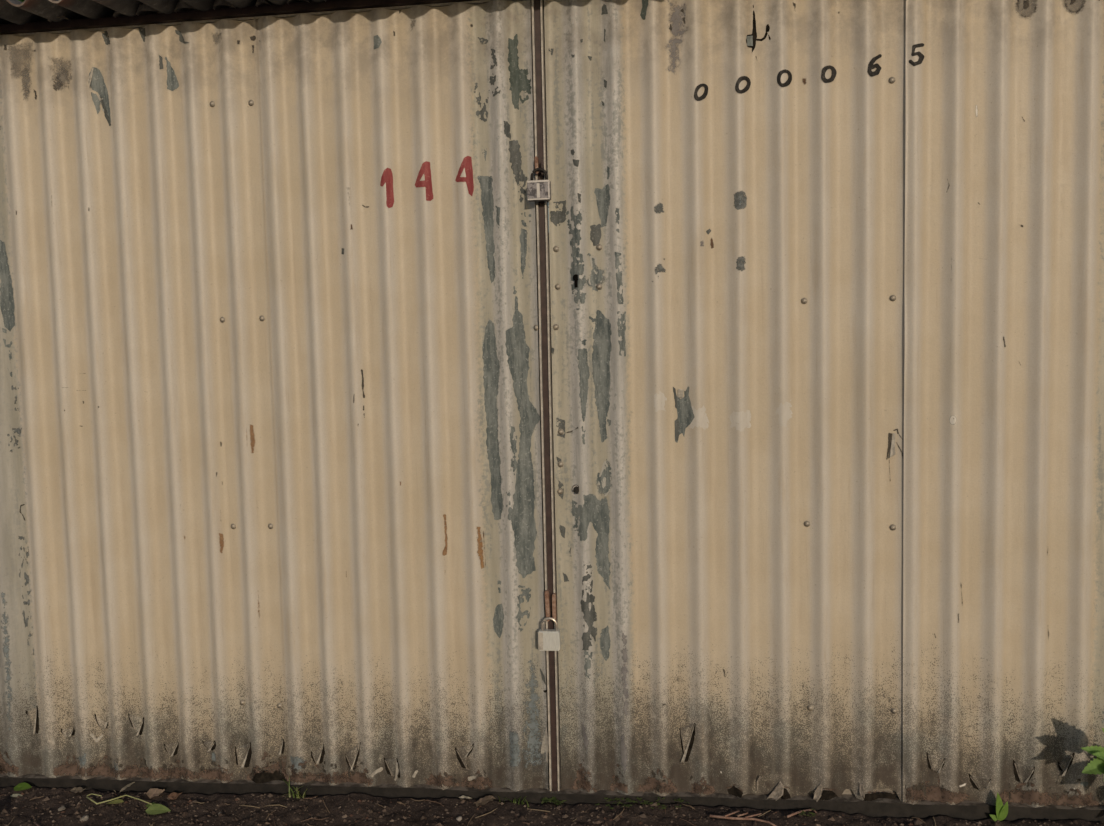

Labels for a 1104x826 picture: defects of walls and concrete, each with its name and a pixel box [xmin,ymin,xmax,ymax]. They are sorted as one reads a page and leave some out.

peeling [88,67,111,126]
peeling [470,24,532,122]
peeling [478,176,500,283]
peeling [0,240,19,411]
peeling [482,121,541,638]
peeling [673,386,694,442]
corrosion [477,527,486,568]
peeling [556,457,629,715]